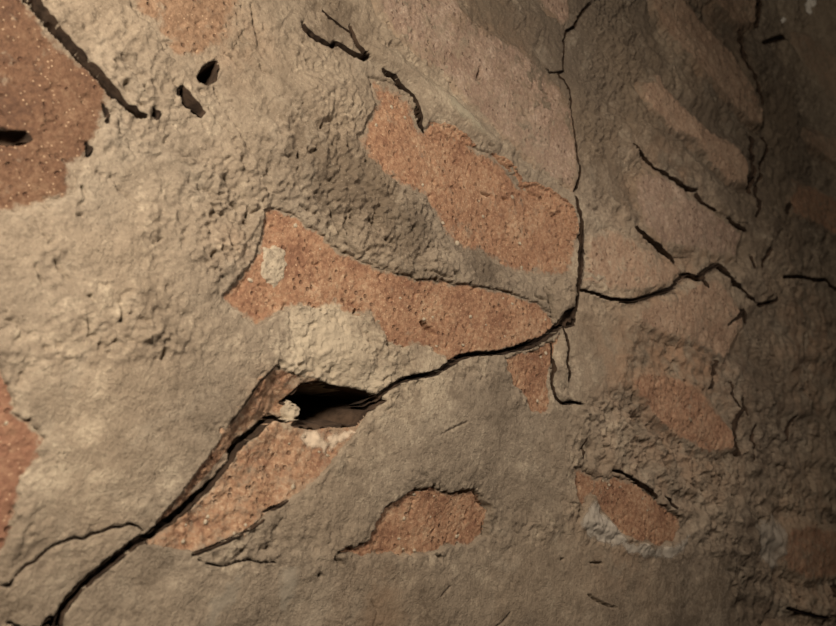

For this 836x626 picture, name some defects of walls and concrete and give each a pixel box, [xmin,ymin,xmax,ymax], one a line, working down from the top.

spalling [0,0,111,213]
crack [84,142,93,157]
crack [22,0,161,124]
crack [301,10,424,133]
spalling [356,0,756,364]
crack [348,0,836,407]
spalling [222,208,559,414]
spalling [0,370,44,550]
crack [1,362,297,626]
spalling [140,366,367,552]
spalling [574,468,682,546]
crack [612,470,678,509]